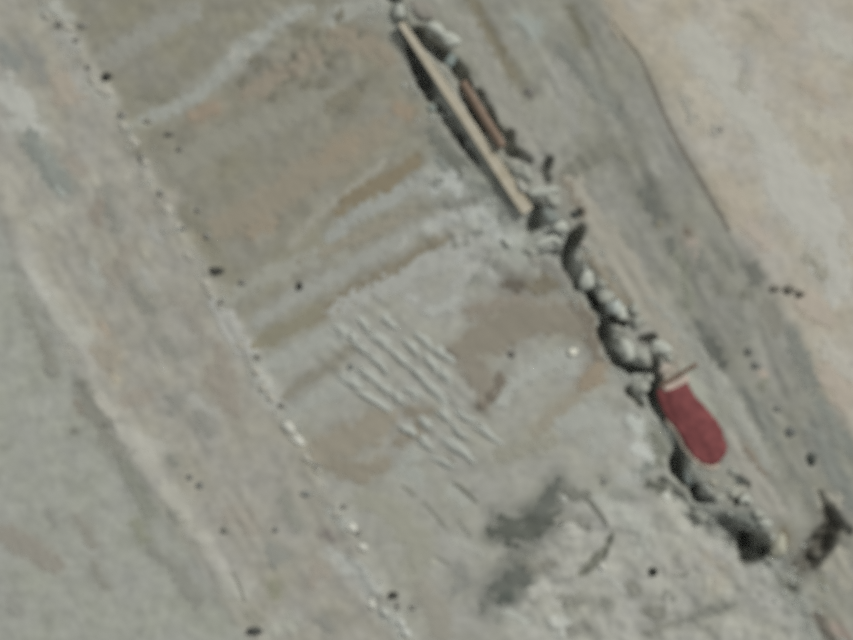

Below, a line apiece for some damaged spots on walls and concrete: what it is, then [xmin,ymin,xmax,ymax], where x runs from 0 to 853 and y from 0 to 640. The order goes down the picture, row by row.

crack [612,20,730,231]
crack [626,389,642,407]
crack [401,485,471,537]
crack [452,483,478,503]
crack [577,494,614,577]